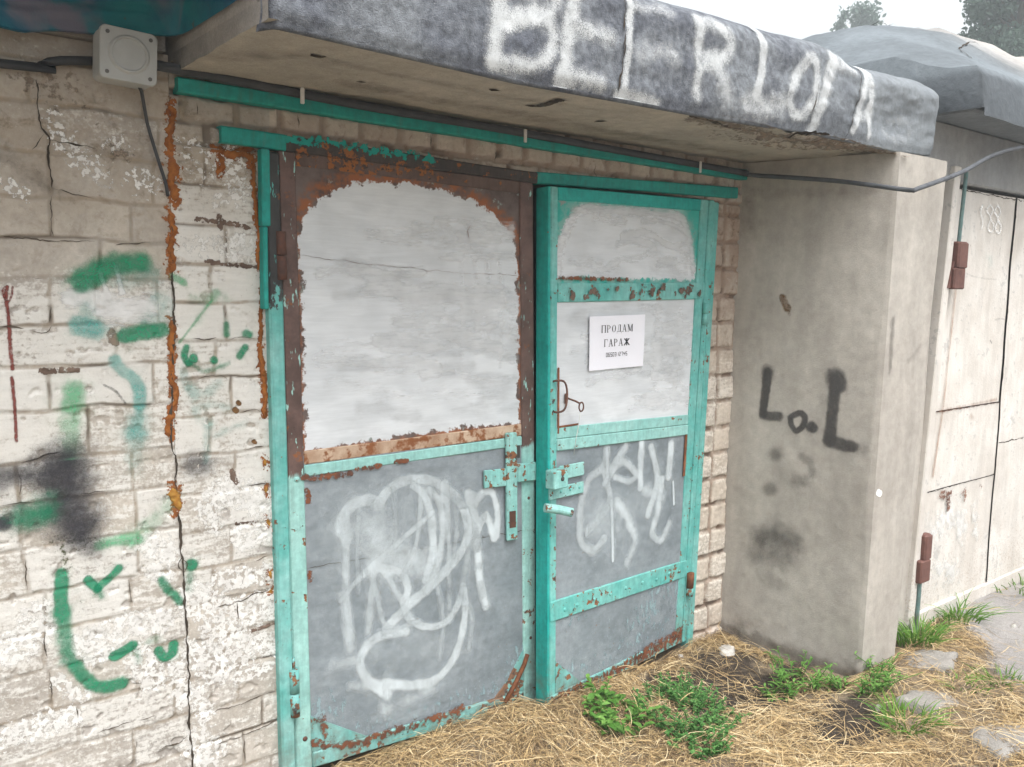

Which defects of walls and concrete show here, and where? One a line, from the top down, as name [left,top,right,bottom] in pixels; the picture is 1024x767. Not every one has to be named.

peeling [0,177,31,203]
crack [4,81,96,242]
peeling [9,73,163,201]
rust [558,276,701,300]
crack [100,226,276,767]
rust [300,424,521,504]
rust [549,624,684,705]
rust [310,703,468,750]